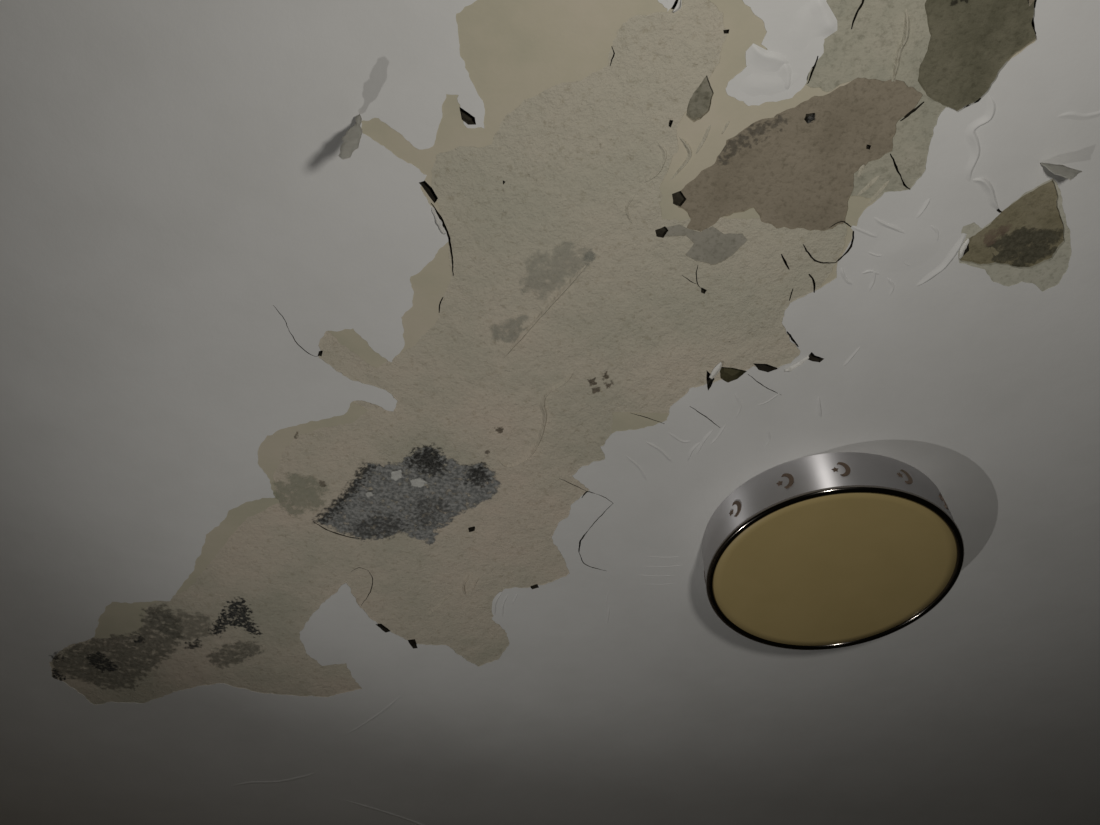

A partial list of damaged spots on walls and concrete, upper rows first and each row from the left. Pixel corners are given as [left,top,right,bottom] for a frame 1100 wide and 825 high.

spalling [958,163,1082,292]
peeling [49,0,1036,704]
leakage [273,445,500,545]
leakage [52,598,261,689]